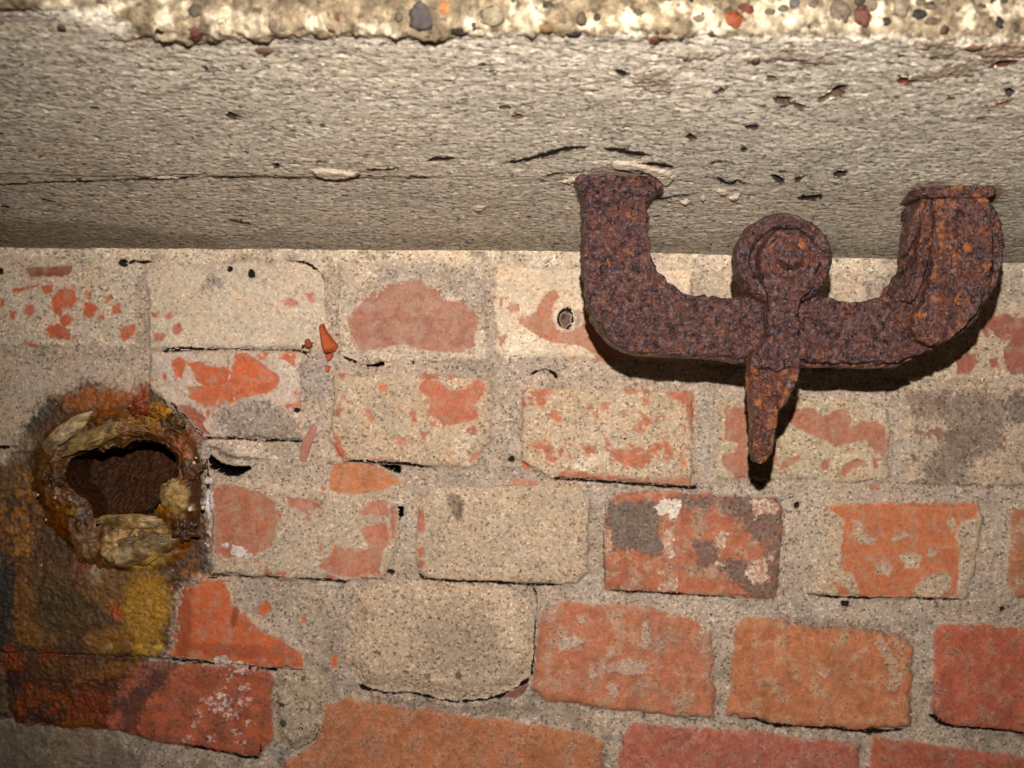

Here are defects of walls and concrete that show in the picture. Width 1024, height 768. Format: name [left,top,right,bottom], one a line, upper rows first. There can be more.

crack [0,156,457,209]
crack [504,145,751,201]
corrosion [895,173,1012,346]
corrosion [775,363,800,409]
corrosion [0,370,218,768]
water stain [95,477,184,569]